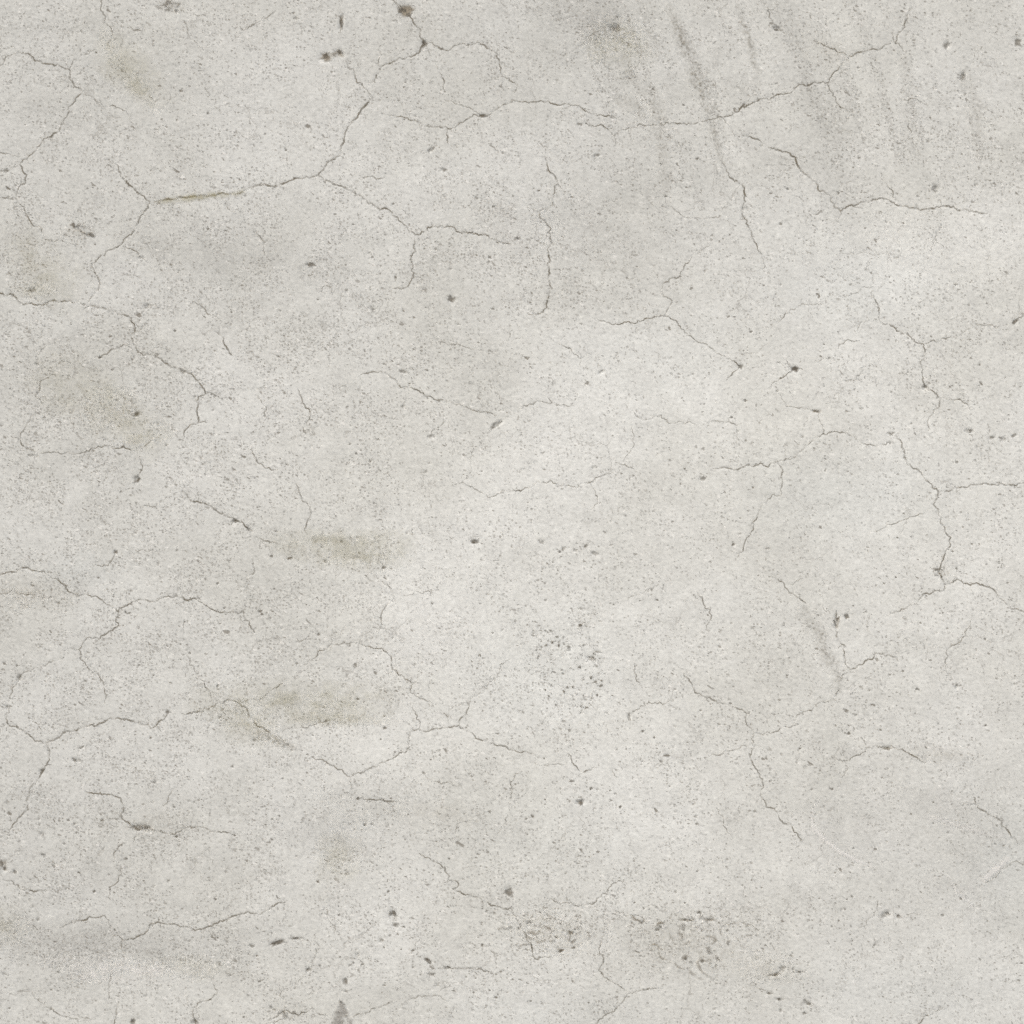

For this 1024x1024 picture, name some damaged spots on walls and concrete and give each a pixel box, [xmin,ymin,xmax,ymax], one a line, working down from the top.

crack [268,79,368,186]
crack [100,168,241,256]